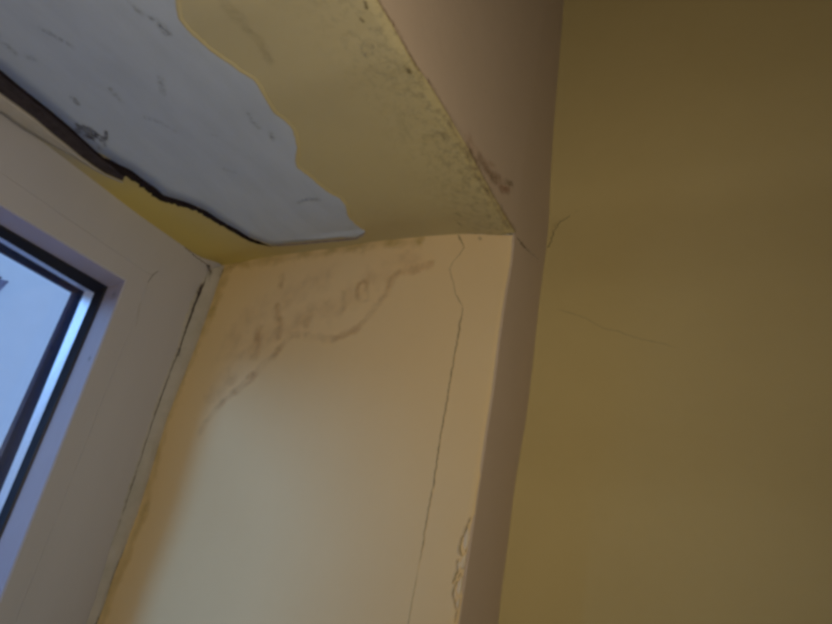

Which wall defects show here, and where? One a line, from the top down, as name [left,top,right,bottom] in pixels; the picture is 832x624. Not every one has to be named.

peeling [0,0,366,245]
crack [407,236,465,624]
flaking render [450,517,472,623]